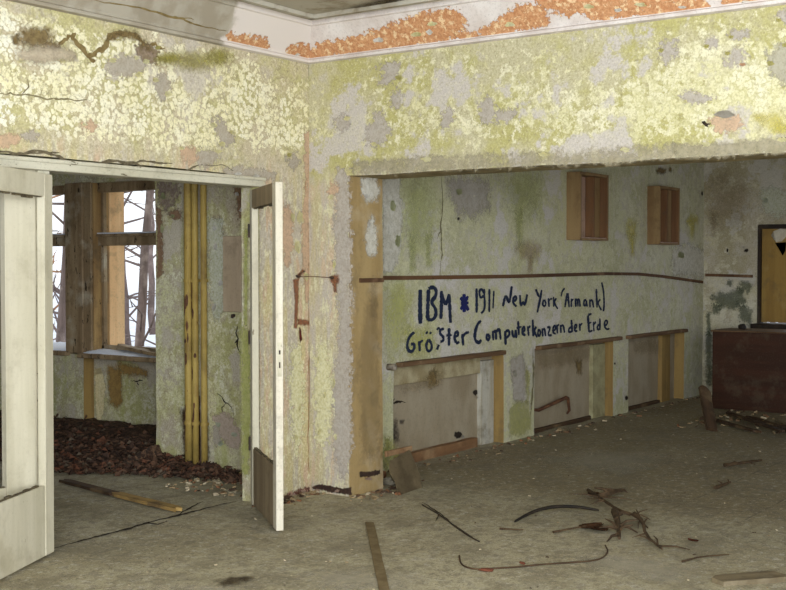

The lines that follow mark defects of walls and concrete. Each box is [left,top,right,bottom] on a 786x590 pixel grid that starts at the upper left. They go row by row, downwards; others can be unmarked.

crack [0,79,90,102]
crack [43,30,165,63]
spalling [104,43,175,102]
peeling [225,30,270,49]
peeling [286,0,711,66]
spalling [703,28,750,68]
spalling [763,42,786,90]
spalling [179,115,277,182]
crack [436,176,444,273]
corrosion [293,270,309,342]
damp [706,281,751,386]
crack [55,501,236,548]